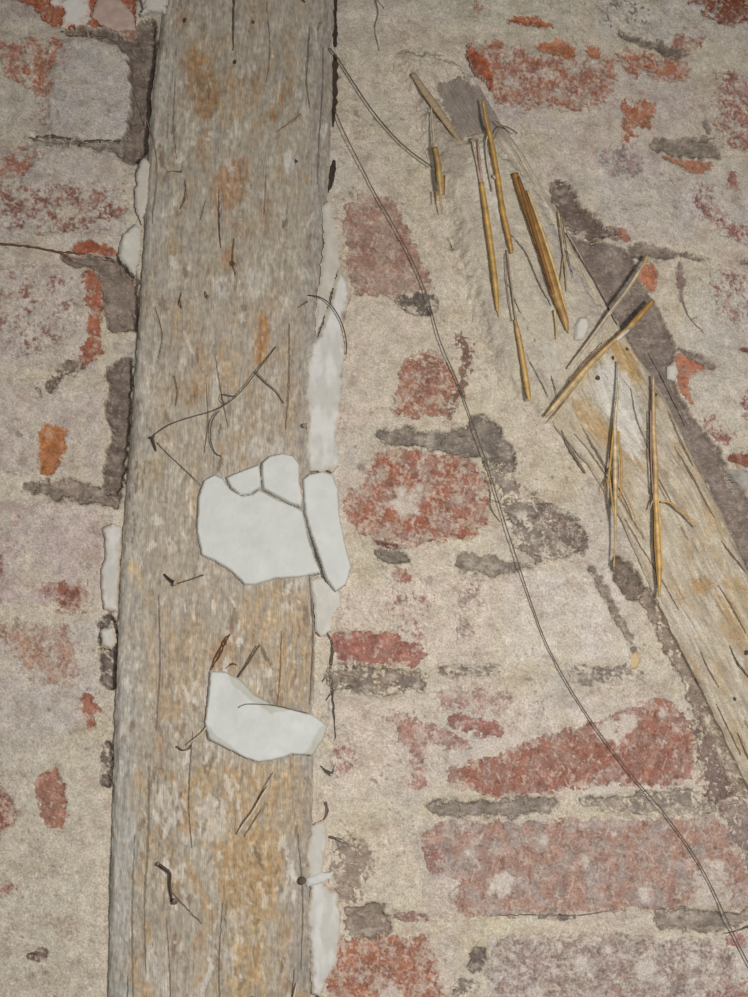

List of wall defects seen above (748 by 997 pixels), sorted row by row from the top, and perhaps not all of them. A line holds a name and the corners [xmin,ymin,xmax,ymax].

spalling [687,0,748,29]
peeling [465,15,706,115]
peeling [599,98,657,180]
spalling [389,348,461,420]
spalling [342,446,493,551]
spalling [386,555,748,997]
spalling [316,911,448,997]